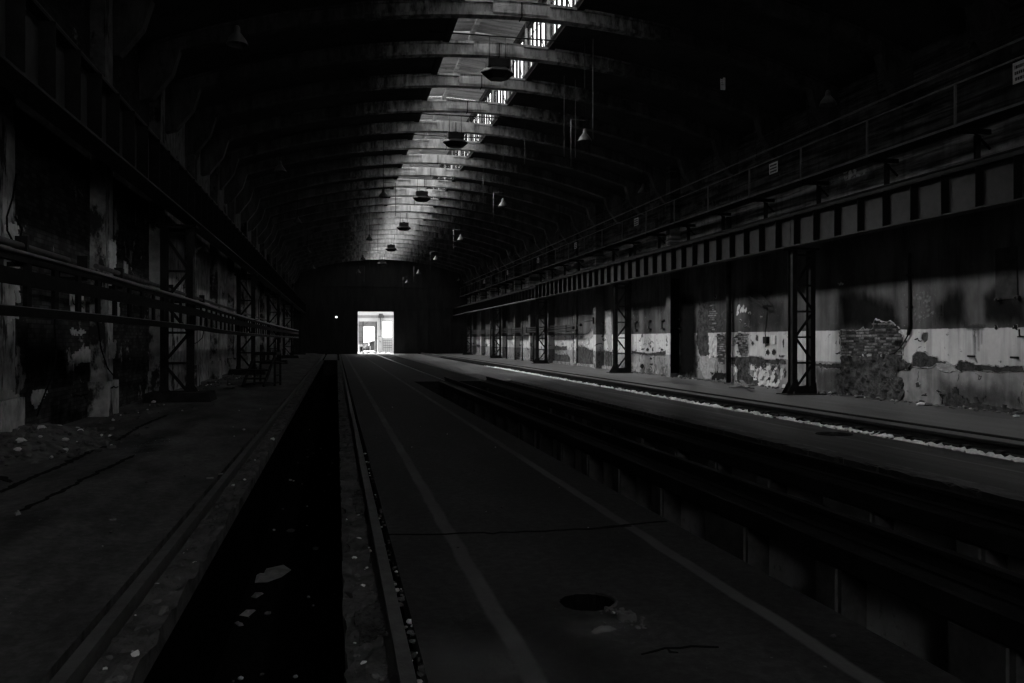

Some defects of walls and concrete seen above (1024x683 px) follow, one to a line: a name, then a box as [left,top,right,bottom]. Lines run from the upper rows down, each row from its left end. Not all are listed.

flaking render [696,302,787,388]
flaking render [816,318,1024,402]
flaking render [936,387,1024,415]